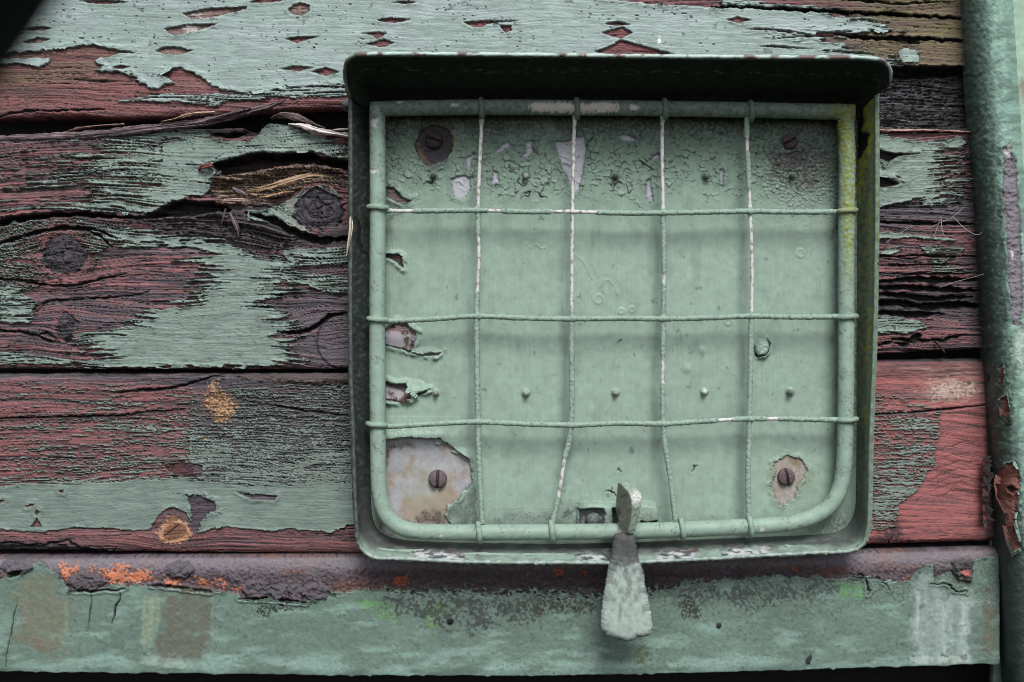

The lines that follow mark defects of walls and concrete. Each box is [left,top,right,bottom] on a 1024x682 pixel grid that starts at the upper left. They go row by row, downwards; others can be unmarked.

peeling [358,0,420,50]
peeling [459,17,521,36]
peeling [591,0,965,64]
crack [416,169,435,187]
crack [516,177,552,200]
crack [585,130,674,210]
peeling [880,133,972,211]
peeling [0,0,354,536]
peeling [385,378,433,406]
peeling [386,434,476,521]
rust [0,555,608,608]
rust [642,549,1000,659]